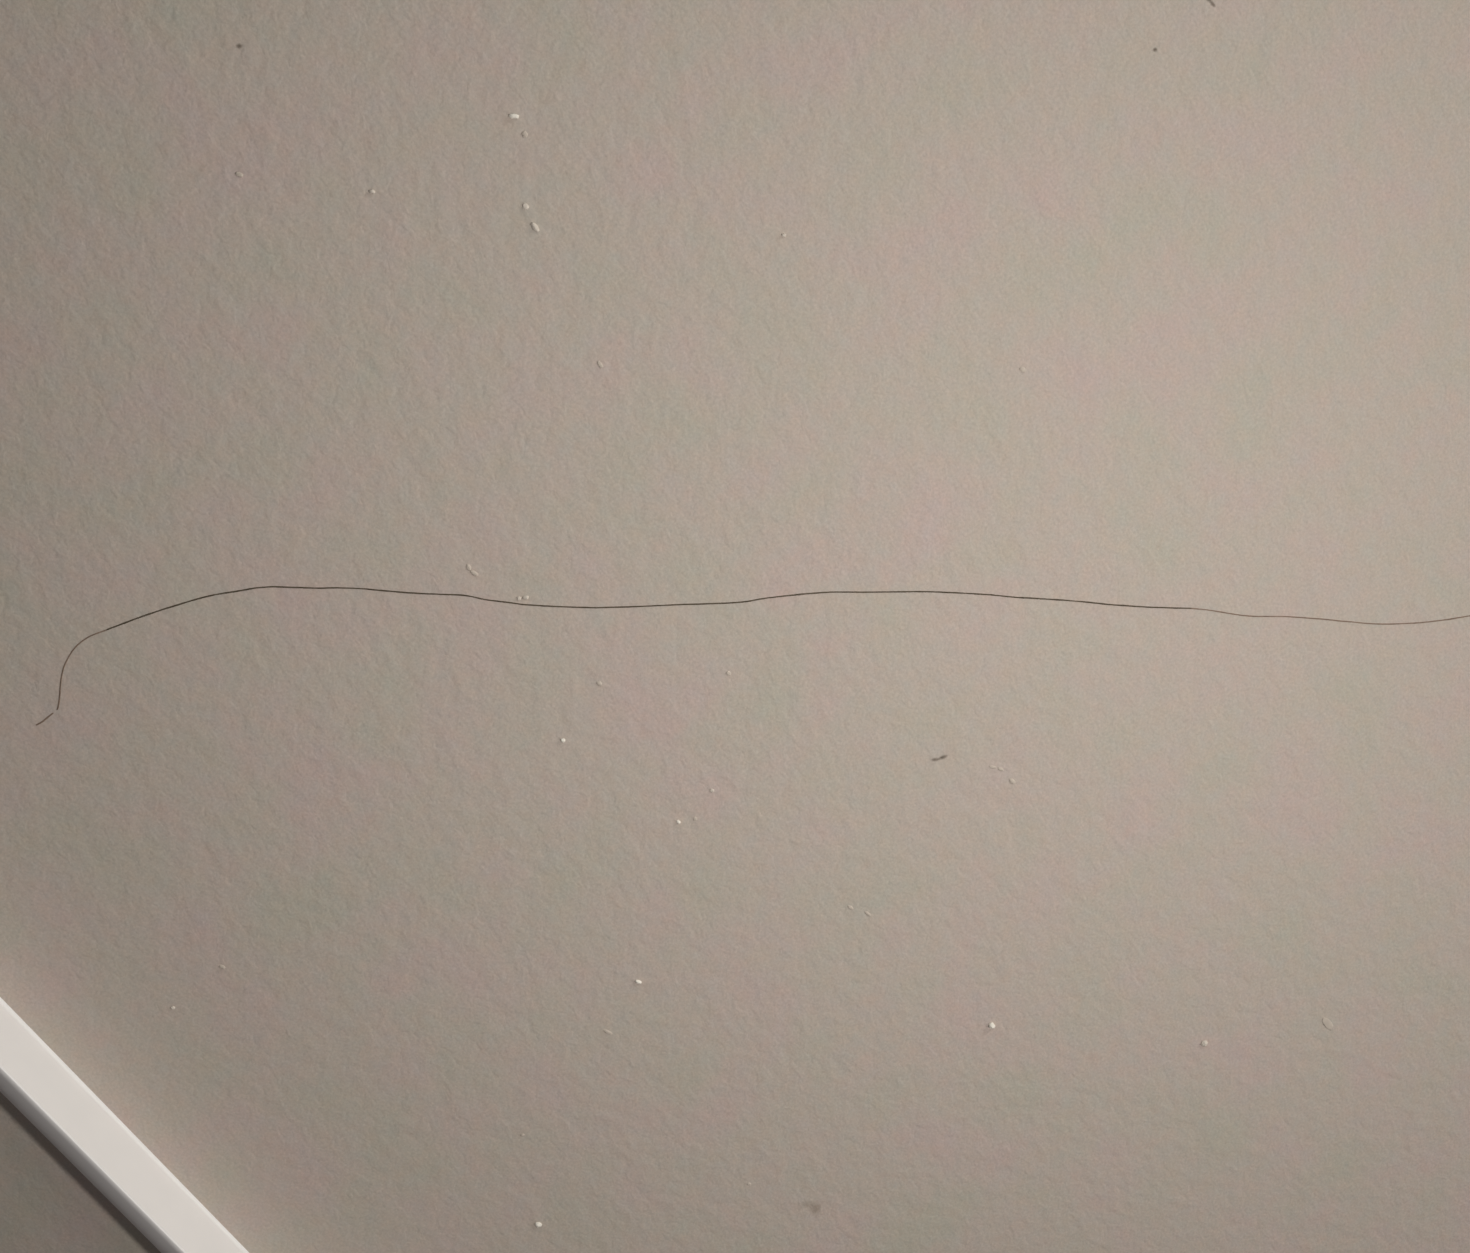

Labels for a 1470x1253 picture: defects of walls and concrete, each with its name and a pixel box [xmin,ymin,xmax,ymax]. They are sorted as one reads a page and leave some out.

crack [36,586,1470,726]